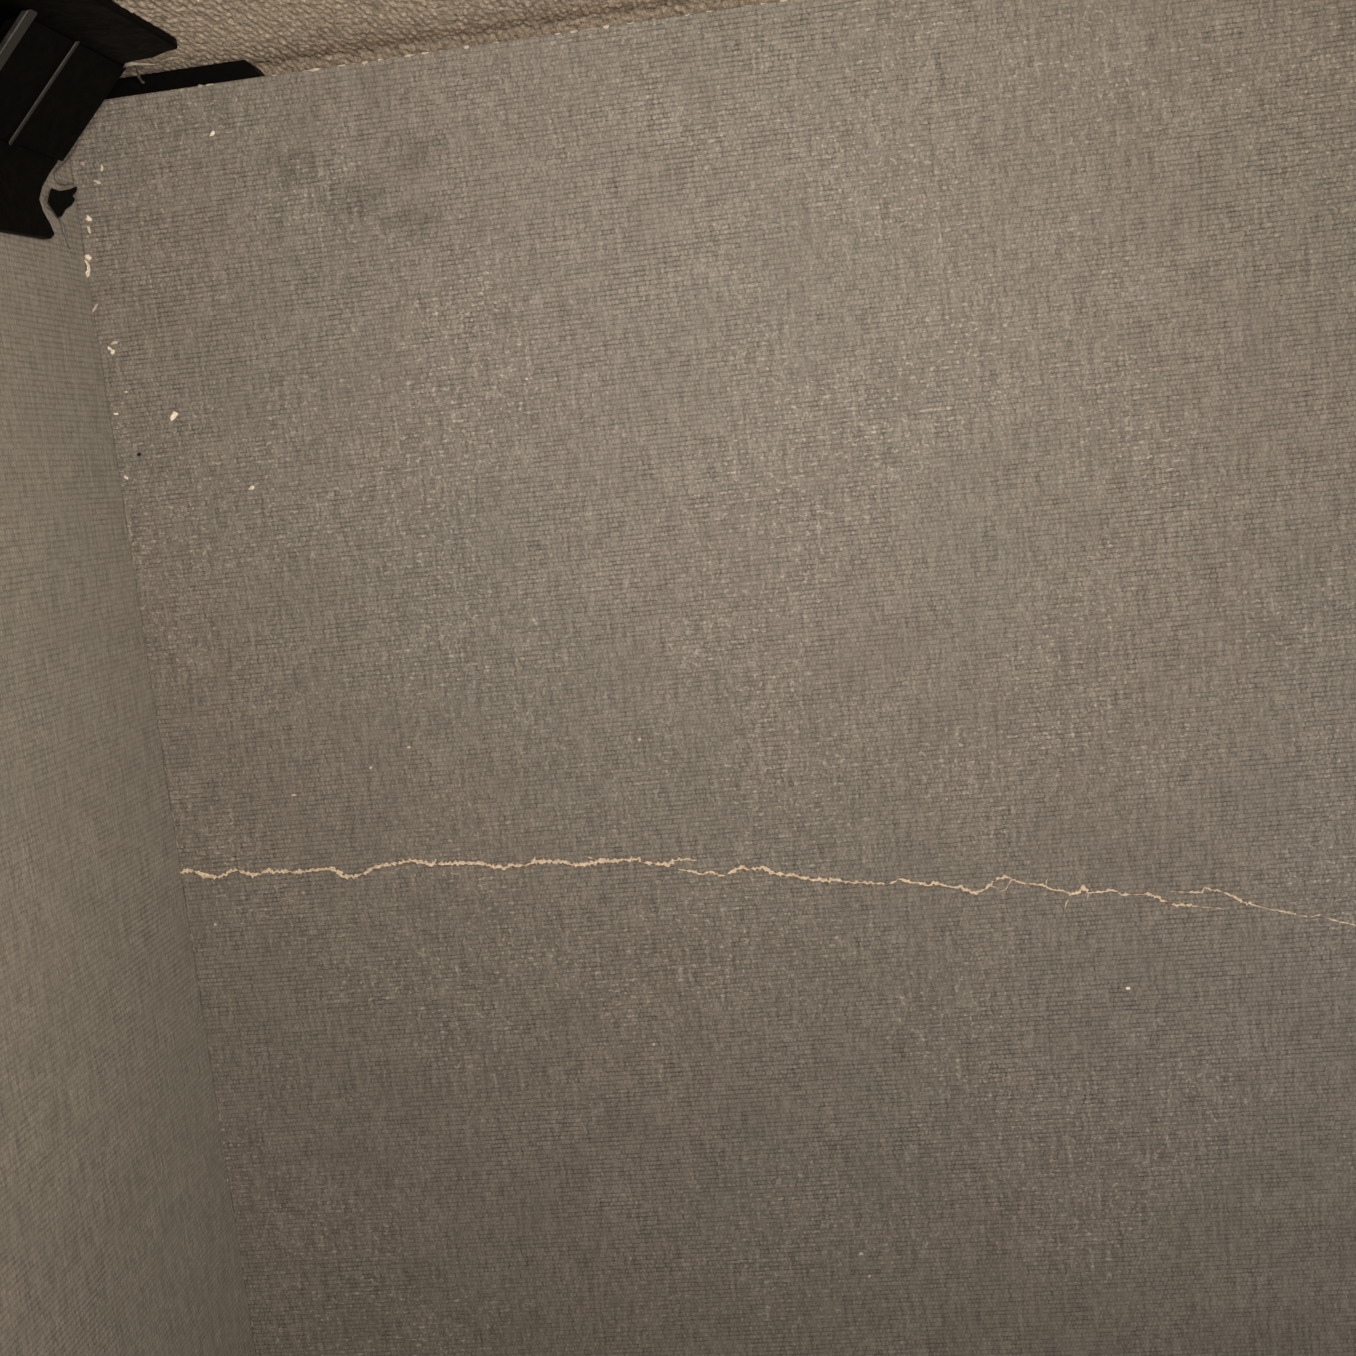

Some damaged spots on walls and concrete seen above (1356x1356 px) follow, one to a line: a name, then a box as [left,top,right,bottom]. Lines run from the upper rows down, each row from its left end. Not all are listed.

crack [180,856,1356,926]